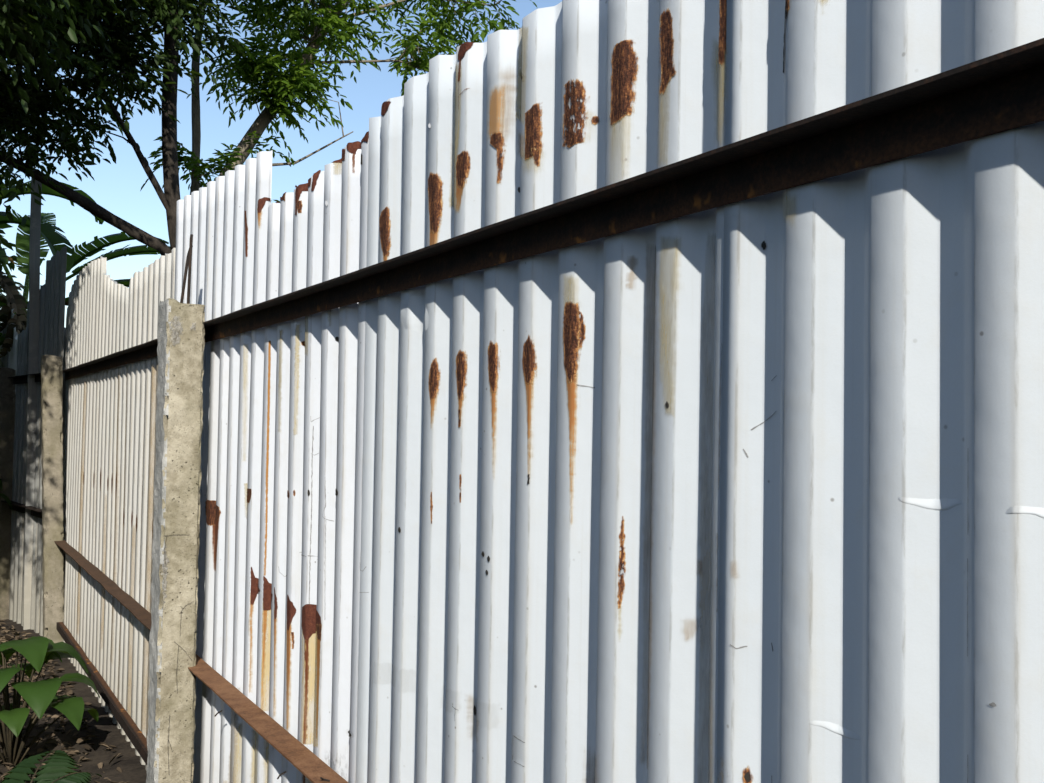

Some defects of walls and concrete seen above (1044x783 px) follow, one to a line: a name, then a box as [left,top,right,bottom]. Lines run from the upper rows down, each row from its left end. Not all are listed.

corrosion [244,170,321,257]
corrosion [331,131,369,172]
corrosion [379,207,391,261]
corrosion [428,173,443,245]
corrosion [456,151,470,208]
corrosion [525,103,543,166]
corrosion [563,40,638,148]
corrosion [659,9,676,94]
corrosion [522,335,537,457]
corrosion [563,302,586,492]
corrosion [205,499,221,570]
corrosion [249,341,322,744]